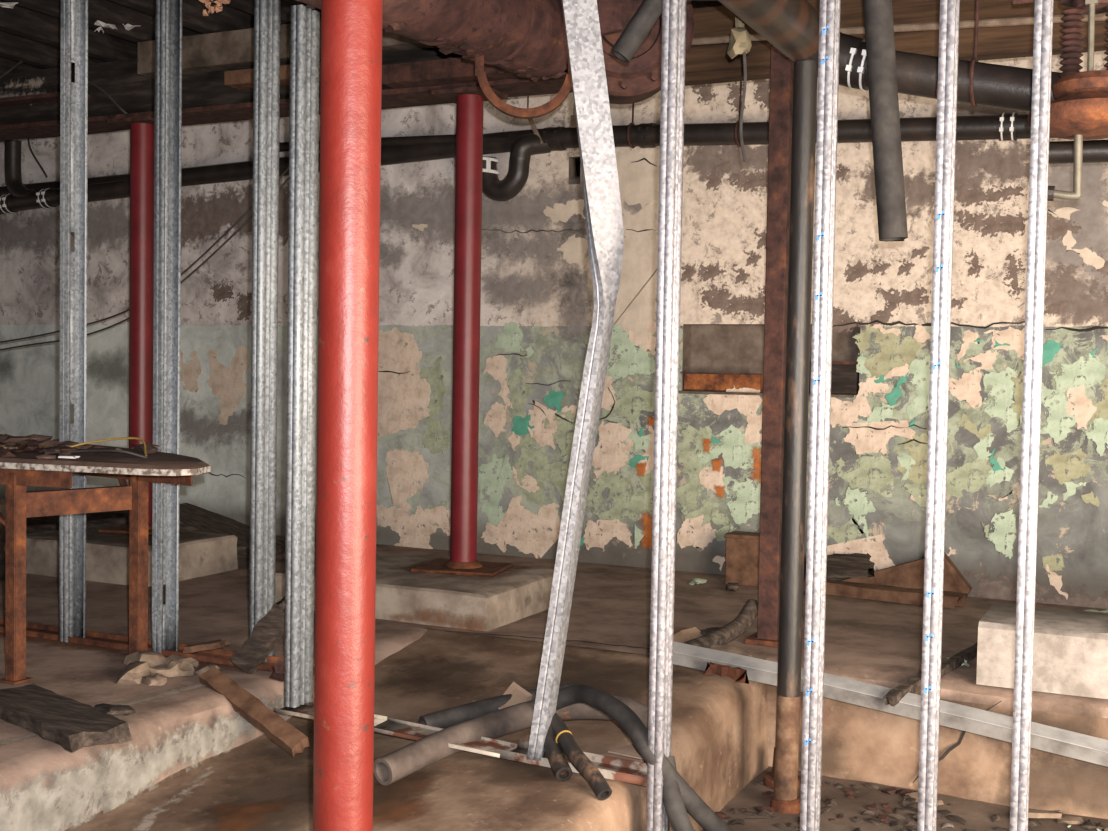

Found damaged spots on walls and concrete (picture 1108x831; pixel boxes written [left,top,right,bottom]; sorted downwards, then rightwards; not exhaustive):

leakage [181,185,253,249]
leakage [279,180,289,245]
leakage [683,144,768,182]
leakage [904,168,935,216]
leakage [955,140,1030,201]
leakage [1044,162,1108,326]
peeling [478,322,578,559]
peeling [579,150,659,551]
peeling [676,387,763,571]
peeling [827,246,932,571]
peeling [946,327,1025,559]
peeling [1038,335,1108,508]